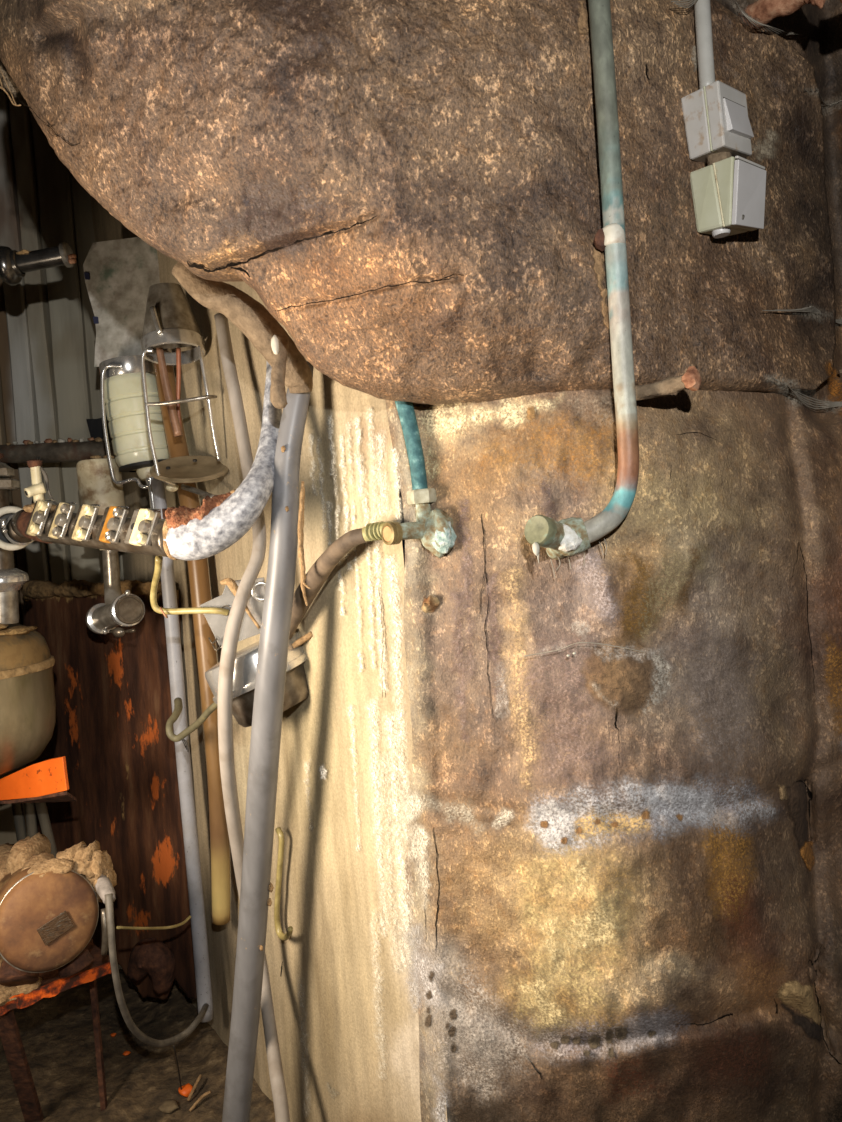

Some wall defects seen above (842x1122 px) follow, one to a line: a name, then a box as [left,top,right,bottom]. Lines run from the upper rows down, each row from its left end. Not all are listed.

damp [309,408,401,544]
damp [338,499,774,1122]
crack [796,779,813,842]
crack [669,1013,733,1026]
crack [808,947,842,1065]